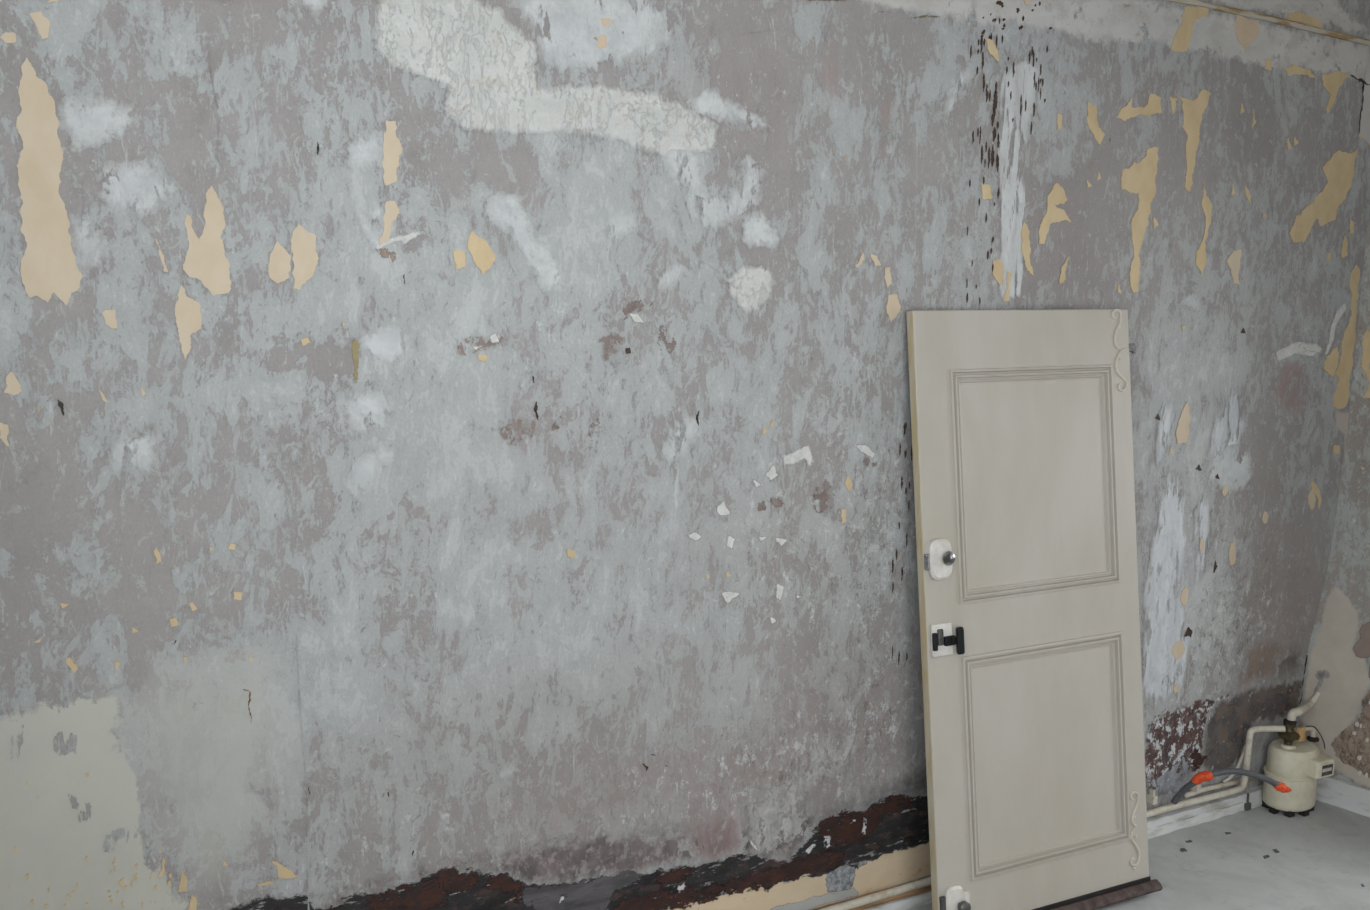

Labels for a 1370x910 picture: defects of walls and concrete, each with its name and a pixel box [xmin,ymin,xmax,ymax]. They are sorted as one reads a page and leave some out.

peeling [853,0,1370,114]
peeling [16,57,83,305]
peeling [155,186,231,359]
peeling [268,224,319,290]
peeling [375,120,421,262]
peeling [992,183,1073,301]
peeling [1116,90,1212,293]
peeling [1276,133,1370,409]
leakage [1210,387,1246,469]
leakage [1141,399,1233,792]
spalling [1330,622,1370,779]
leakage [305,756,927,909]